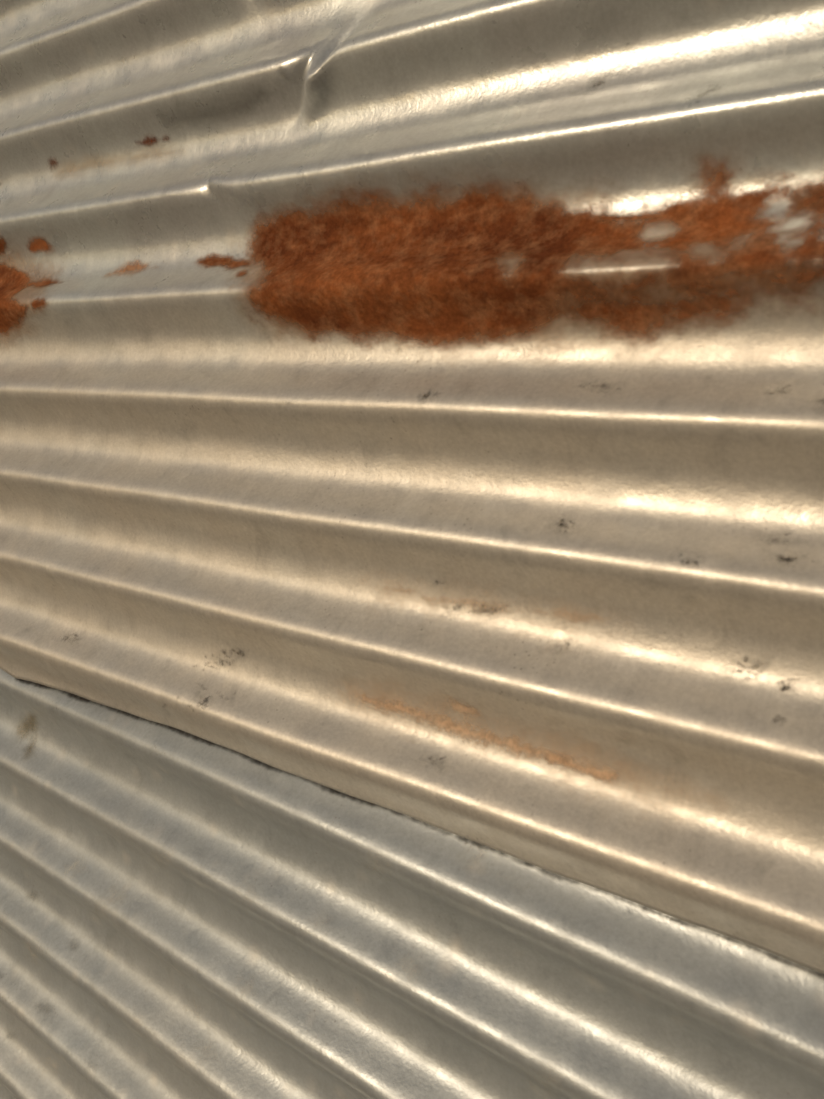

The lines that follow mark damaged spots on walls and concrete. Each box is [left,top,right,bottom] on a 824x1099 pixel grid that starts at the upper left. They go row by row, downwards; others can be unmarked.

corrosion [0,238,57,334]
corrosion [198,164,824,346]